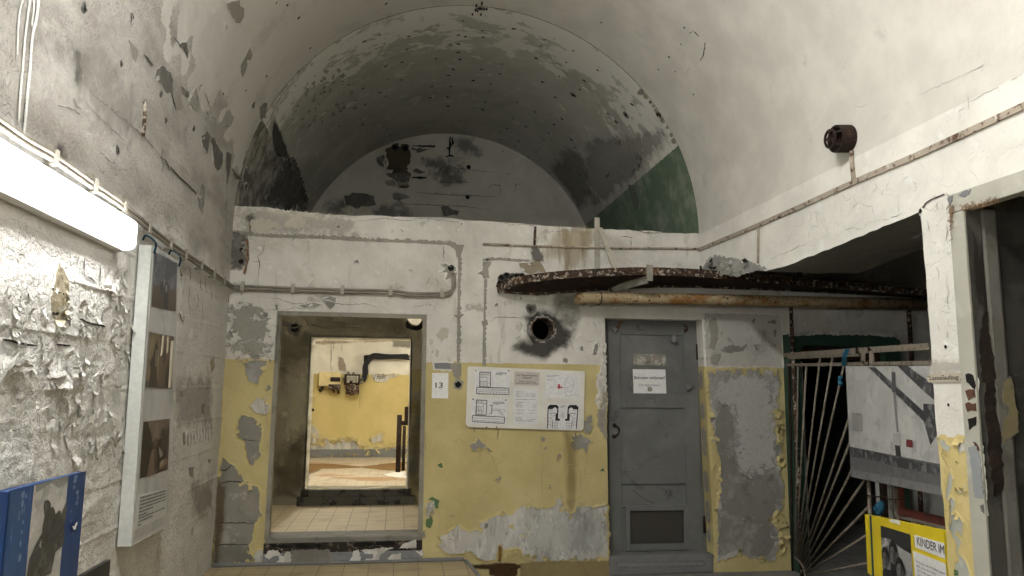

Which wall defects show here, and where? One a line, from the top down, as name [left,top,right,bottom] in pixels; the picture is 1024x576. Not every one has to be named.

peeling [155,65,200,113]
peeling [201,131,251,197]
leakage [374,201,408,217]
spalling [374,141,436,203]
leakage [587,131,665,209]
rust [946,197,997,241]
peeling [0,260,136,466]
peeling [207,295,337,564]
peeling [702,311,791,564]
rust [965,310,1004,516]
peeling [349,494,611,564]
peeling [937,434,972,576]